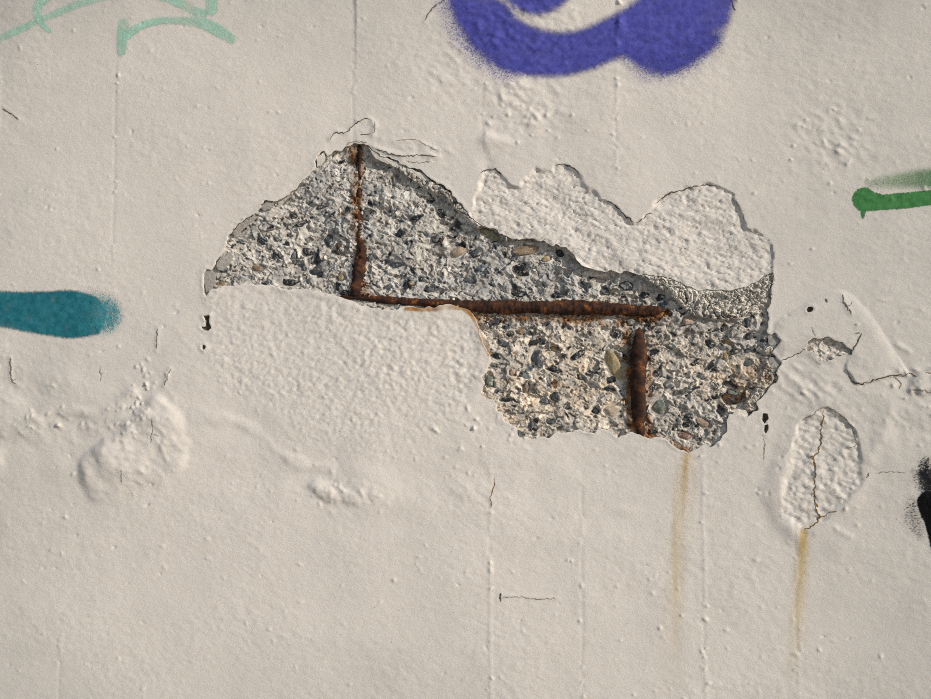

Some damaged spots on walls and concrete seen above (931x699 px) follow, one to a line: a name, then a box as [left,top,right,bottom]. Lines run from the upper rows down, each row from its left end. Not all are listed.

spalling [204,143,781,453]
rust [619,311,670,345]
spalling [806,337,852,363]
crack [825,296,862,349]
rust [626,368,655,439]
crack [847,371,931,393]
crack [803,406,857,529]